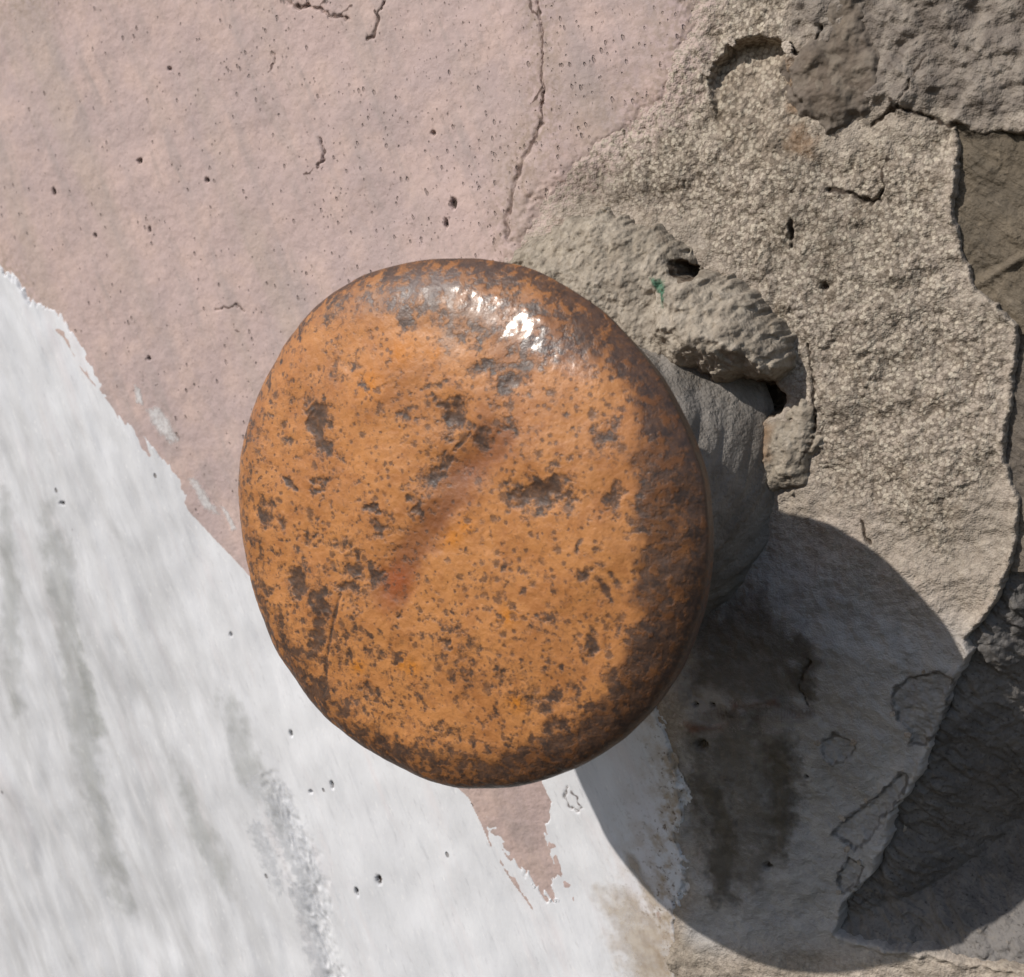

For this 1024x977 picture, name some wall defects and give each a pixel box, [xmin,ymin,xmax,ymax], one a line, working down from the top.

crack [289,0,386,40]
crack [504,0,546,236]
crack [828,156,889,205]
spalling [832,124,1024,964]
peeling [467,781,561,903]